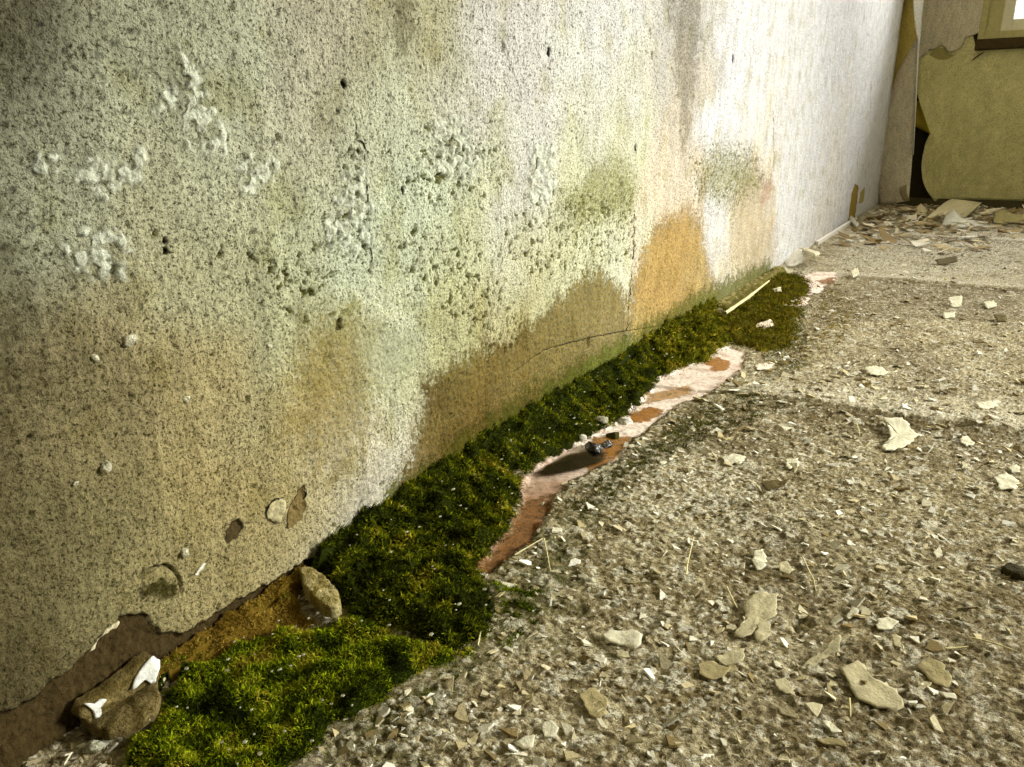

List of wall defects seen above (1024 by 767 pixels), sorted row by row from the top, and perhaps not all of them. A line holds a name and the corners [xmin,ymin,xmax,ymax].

flaking render [929,48,954,60]
damp [287,305,416,478]
damp [393,199,717,490]
crack [515,214,656,371]
spalling [226,519,244,543]
spalling [266,484,307,528]
spalling [0,558,313,767]